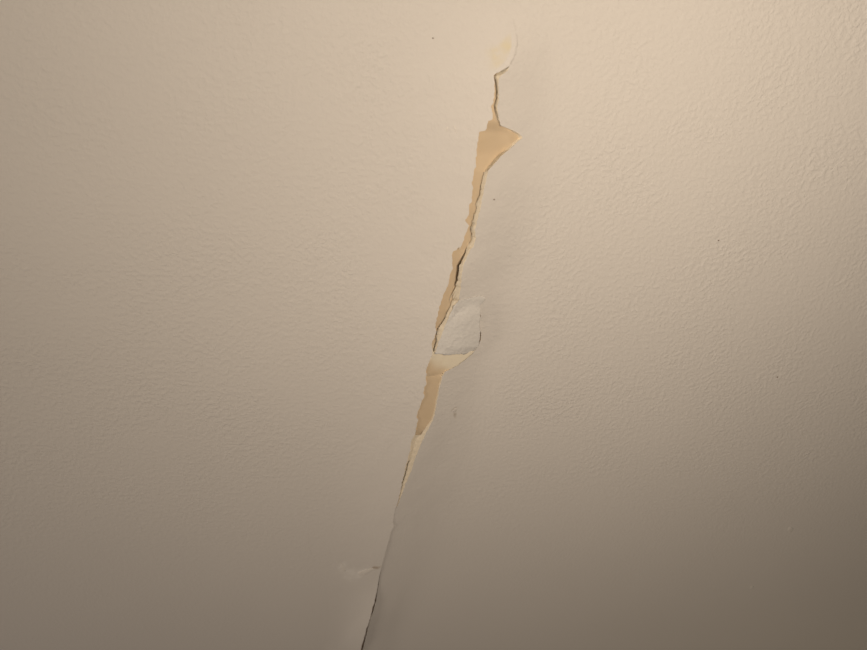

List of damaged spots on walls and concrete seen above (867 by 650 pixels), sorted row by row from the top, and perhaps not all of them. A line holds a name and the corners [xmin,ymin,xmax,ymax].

crack [361,565,382,650]